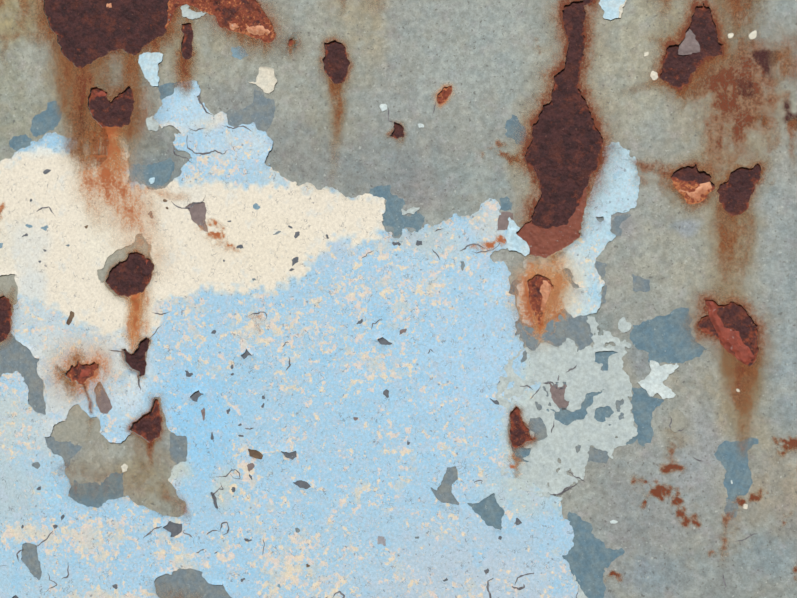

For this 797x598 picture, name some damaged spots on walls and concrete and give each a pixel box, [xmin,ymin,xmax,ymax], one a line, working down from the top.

corrosion [35,0,297,232]
corrosion [320,38,353,131]
corrosion [496,0,610,336]
corrosion [636,0,797,260]
corrosion [0,295,12,342]
corrosion [56,352,108,409]
corrosion [106,250,155,376]
corrosion [128,398,163,458]
peeling [0,52,625,598]
corrosion [509,407,535,468]
peeling [495,142,707,497]
corrosion [694,294,765,414]